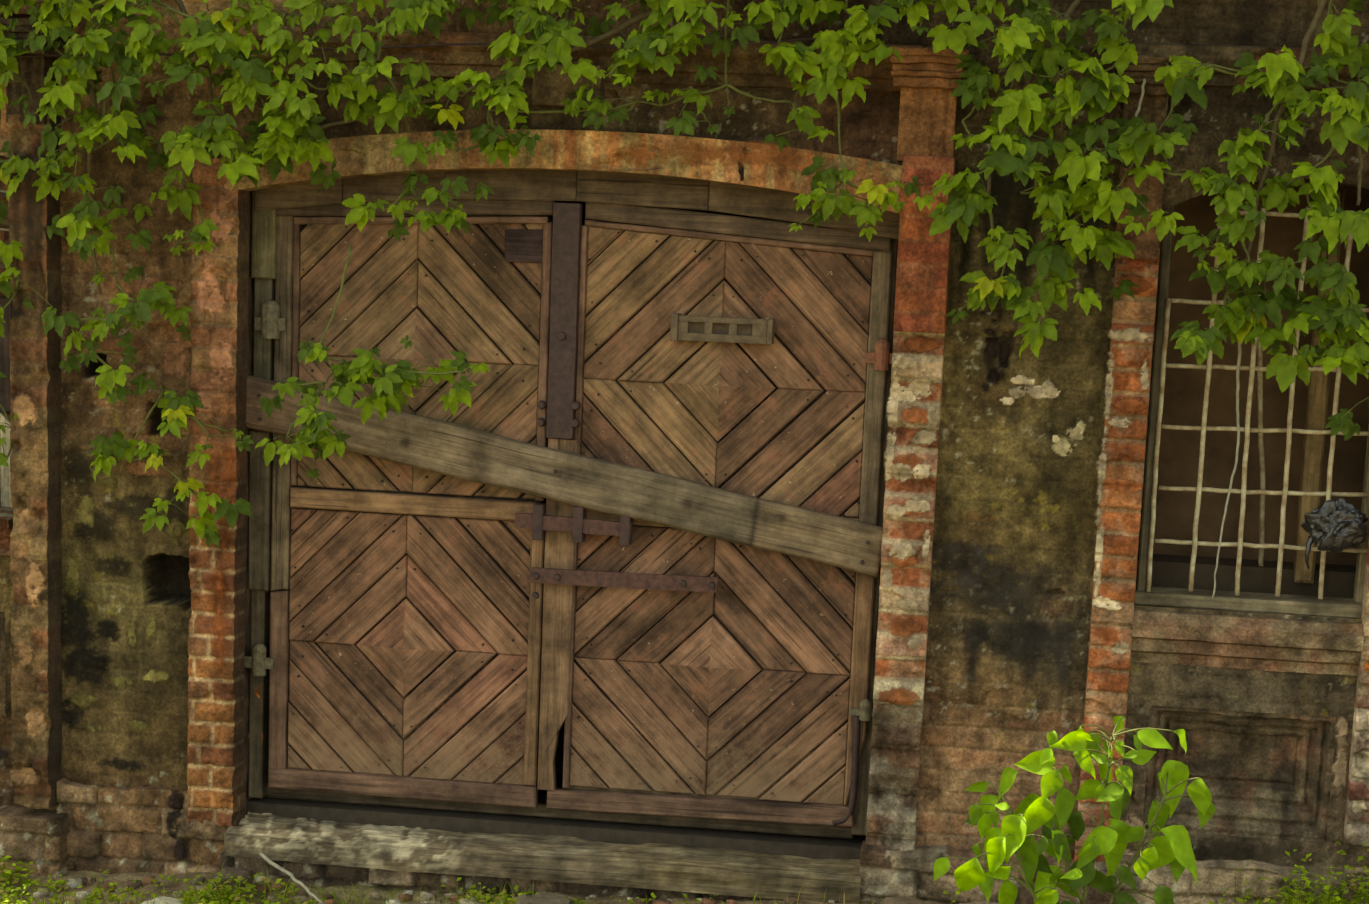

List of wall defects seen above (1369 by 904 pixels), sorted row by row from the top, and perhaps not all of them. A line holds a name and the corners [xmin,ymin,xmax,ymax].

water stain [75,489,187,541]
water stain [97,558,130,576]
water stain [61,594,119,683]
water stain [103,759,140,771]